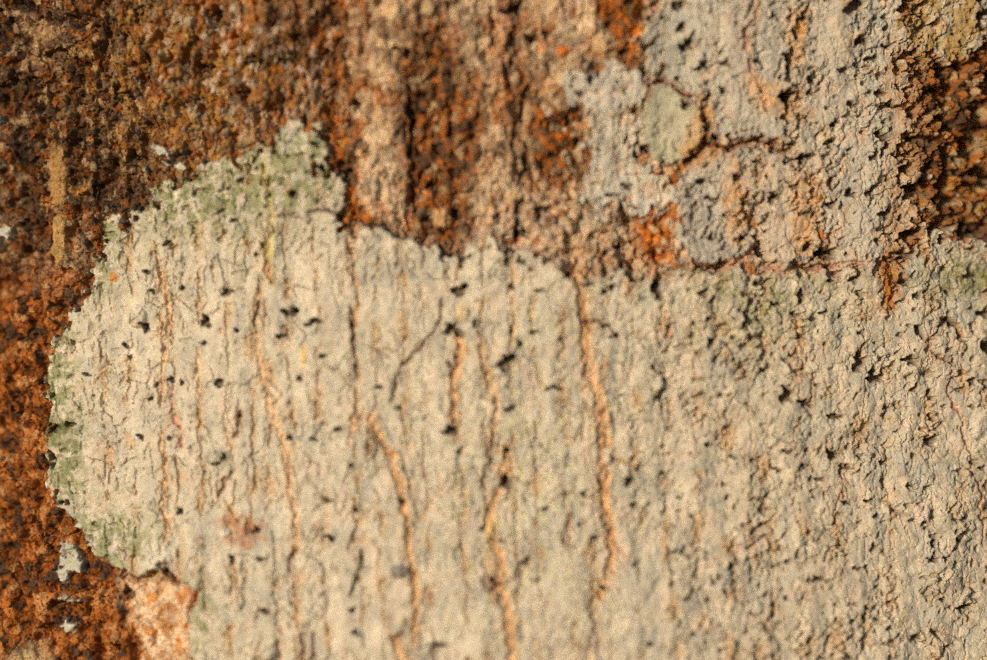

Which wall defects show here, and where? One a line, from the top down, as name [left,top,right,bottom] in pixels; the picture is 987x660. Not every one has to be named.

peeling [20,11,112,92]
corrosion [399,10,488,253]
corrosion [528,99,588,193]
corrosion [345,178,378,240]
corrosion [568,202,685,272]
crack [152,249,207,545]
crack [232,162,438,660]
crack [446,150,533,660]
crack [561,171,637,660]
spalling [624,464,643,488]
spalling [780,449,807,473]
spalling [852,543,879,572]